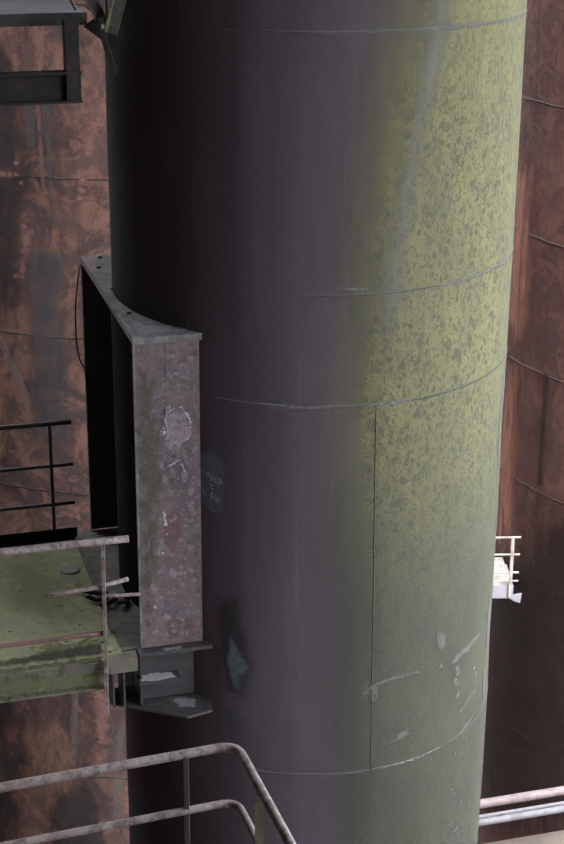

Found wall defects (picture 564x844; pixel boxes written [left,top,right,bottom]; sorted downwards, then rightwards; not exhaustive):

rust [0,161,23,185]
rust [12,212,34,279]
rust [508,168,531,335]
peeling [138,351,201,640]
rust [498,371,516,543]